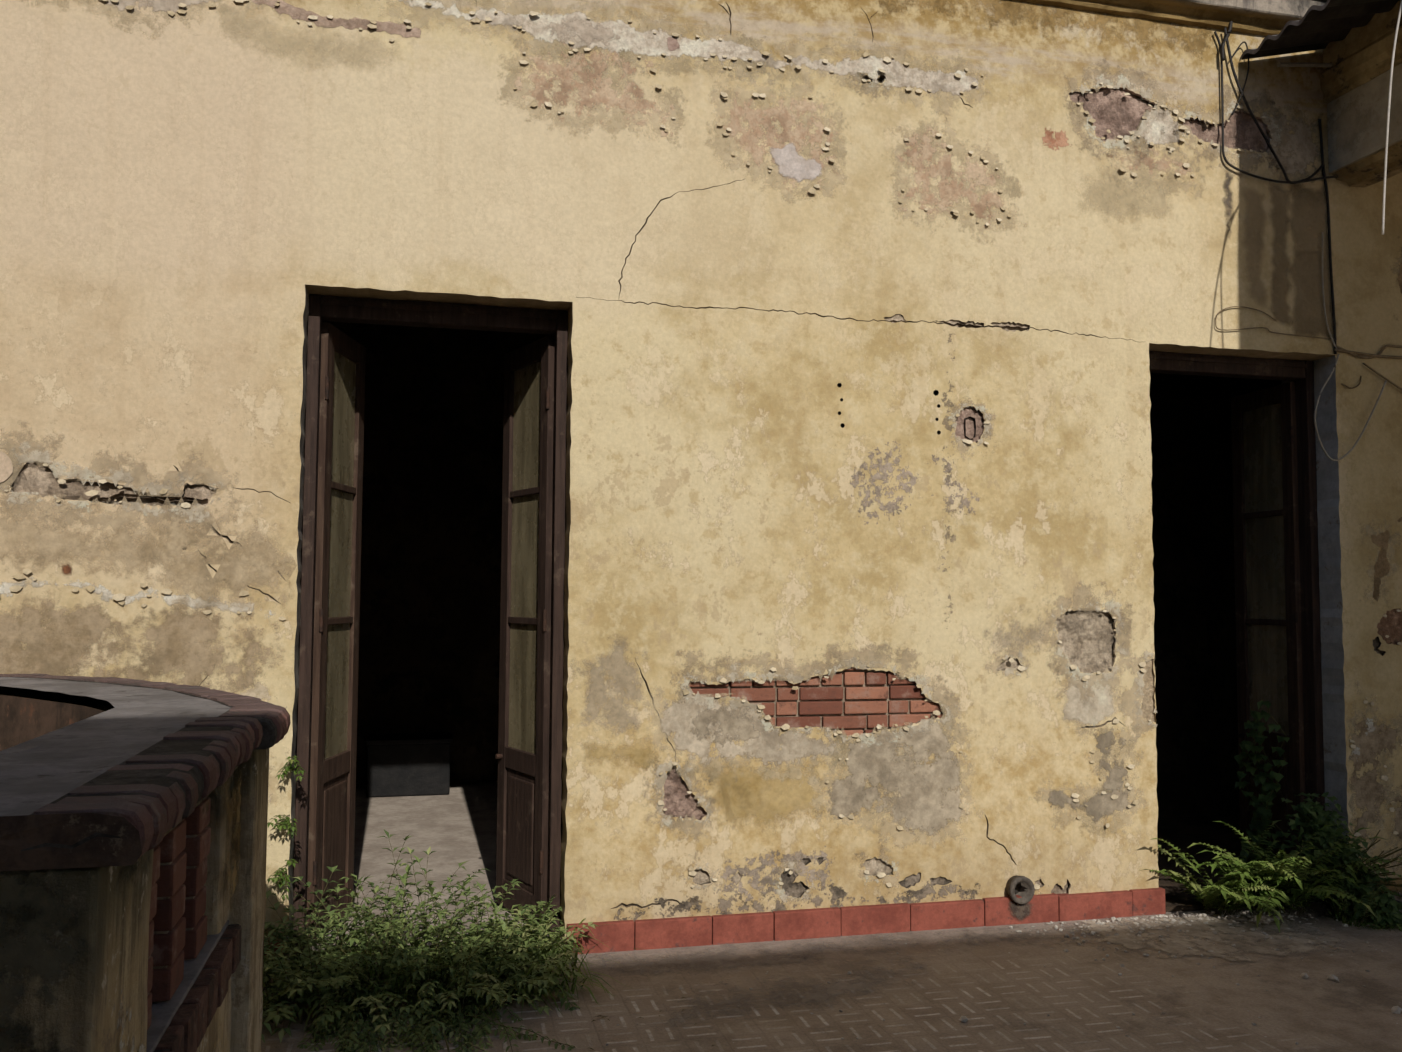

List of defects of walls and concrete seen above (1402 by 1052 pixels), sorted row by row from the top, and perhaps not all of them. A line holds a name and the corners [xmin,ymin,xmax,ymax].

peeling [234,0,984,137]
flaking render [1042,59,1287,177]
crack [577,179,1137,342]
damp [1224,173,1232,230]
damp [1268,114,1333,336]
flaking render [0,422,237,540]
flaking render [1371,517,1402,656]
flaking render [676,644,960,760]
flaking render [1041,582,1158,741]
peeling [1049,750,1139,828]
peeling [614,848,981,921]
damp [0,870,87,1052]